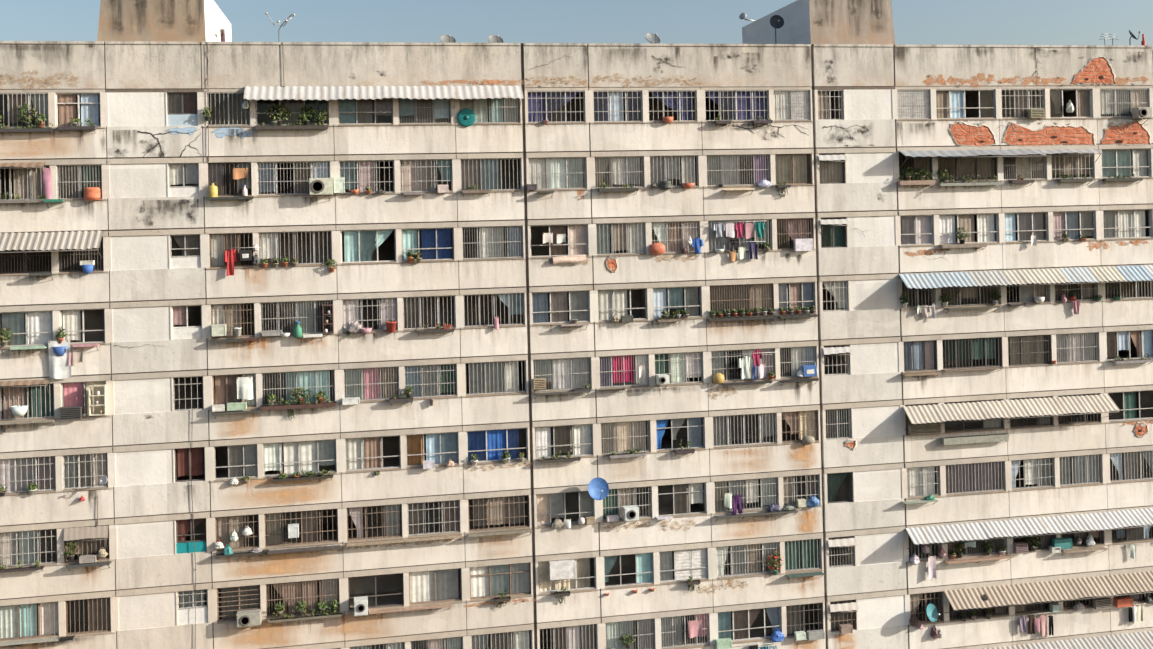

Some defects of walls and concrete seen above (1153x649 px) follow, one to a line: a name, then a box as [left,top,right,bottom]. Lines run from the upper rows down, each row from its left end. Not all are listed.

spalling [924,55,1148,86]
crack [138,129,202,158]
crack [733,124,868,141]
spalling [948,120,1152,148]
damp [141,199,198,225]
peeling [1087,239,1147,250]
spalling [1122,421,1153,438]